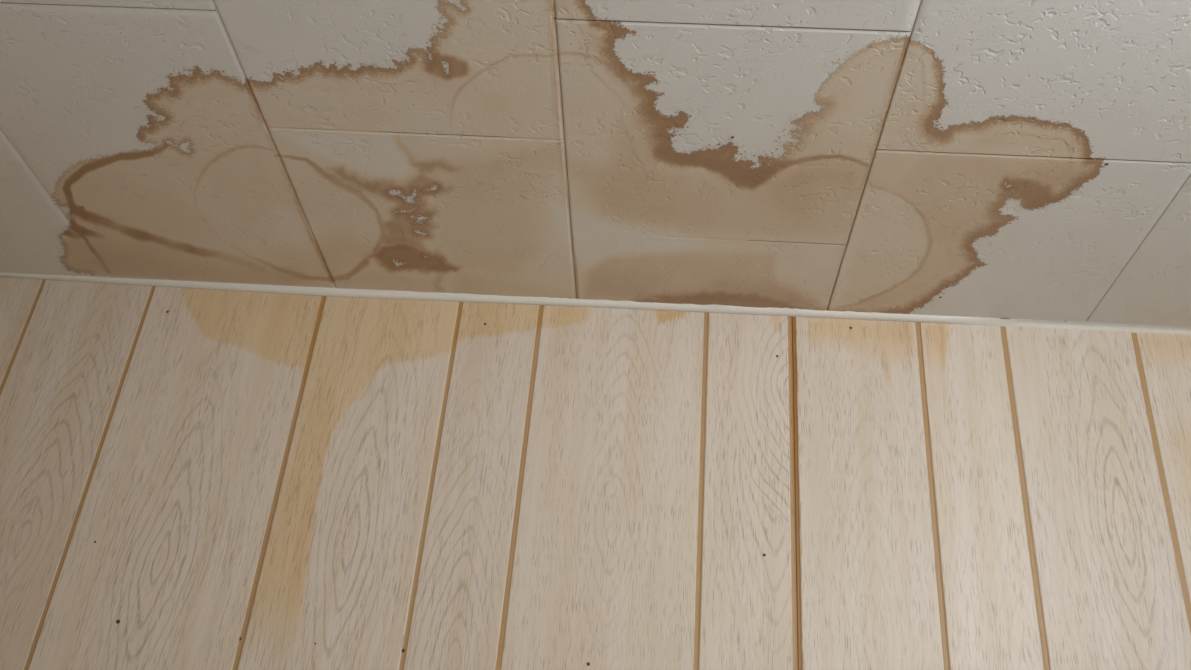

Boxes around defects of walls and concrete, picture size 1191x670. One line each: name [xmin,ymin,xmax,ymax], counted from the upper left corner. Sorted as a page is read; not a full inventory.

water stain [51,0,1106,422]
water stain [165,287,611,669]